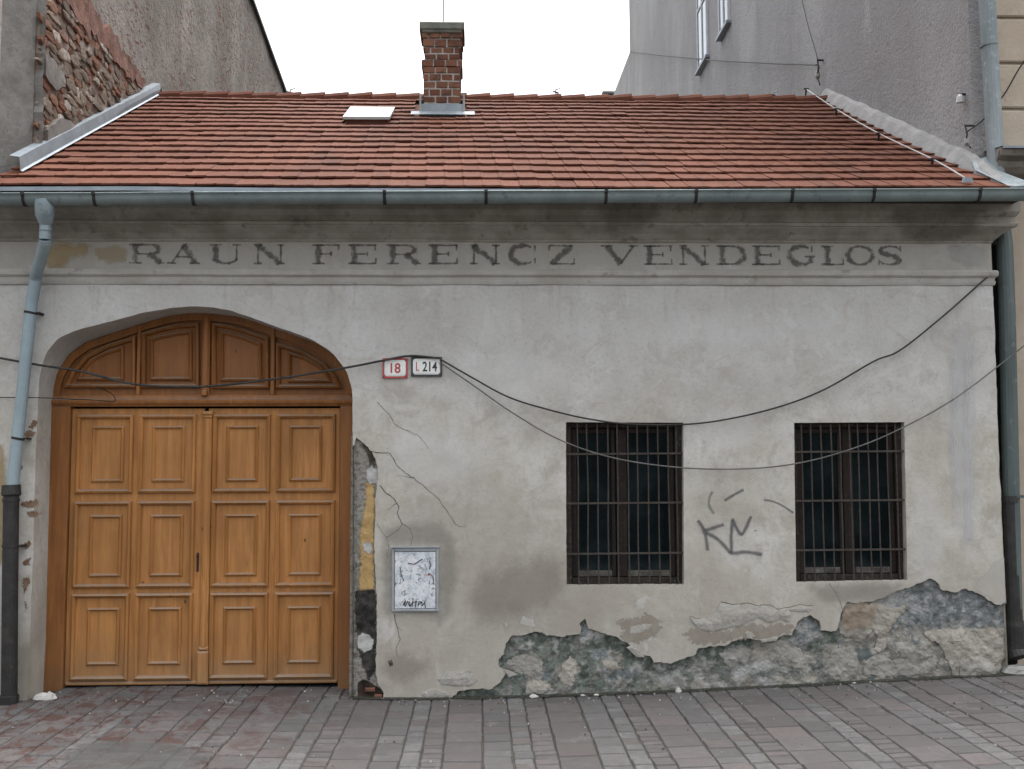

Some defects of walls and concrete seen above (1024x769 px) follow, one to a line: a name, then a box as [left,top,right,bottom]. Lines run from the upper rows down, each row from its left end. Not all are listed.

flaking render [21,499,42,517]
crack [371,451,465,548]
flaking render [22,540,31,612]
flaking render [349,436,393,699]
flaking render [454,559,1006,698]